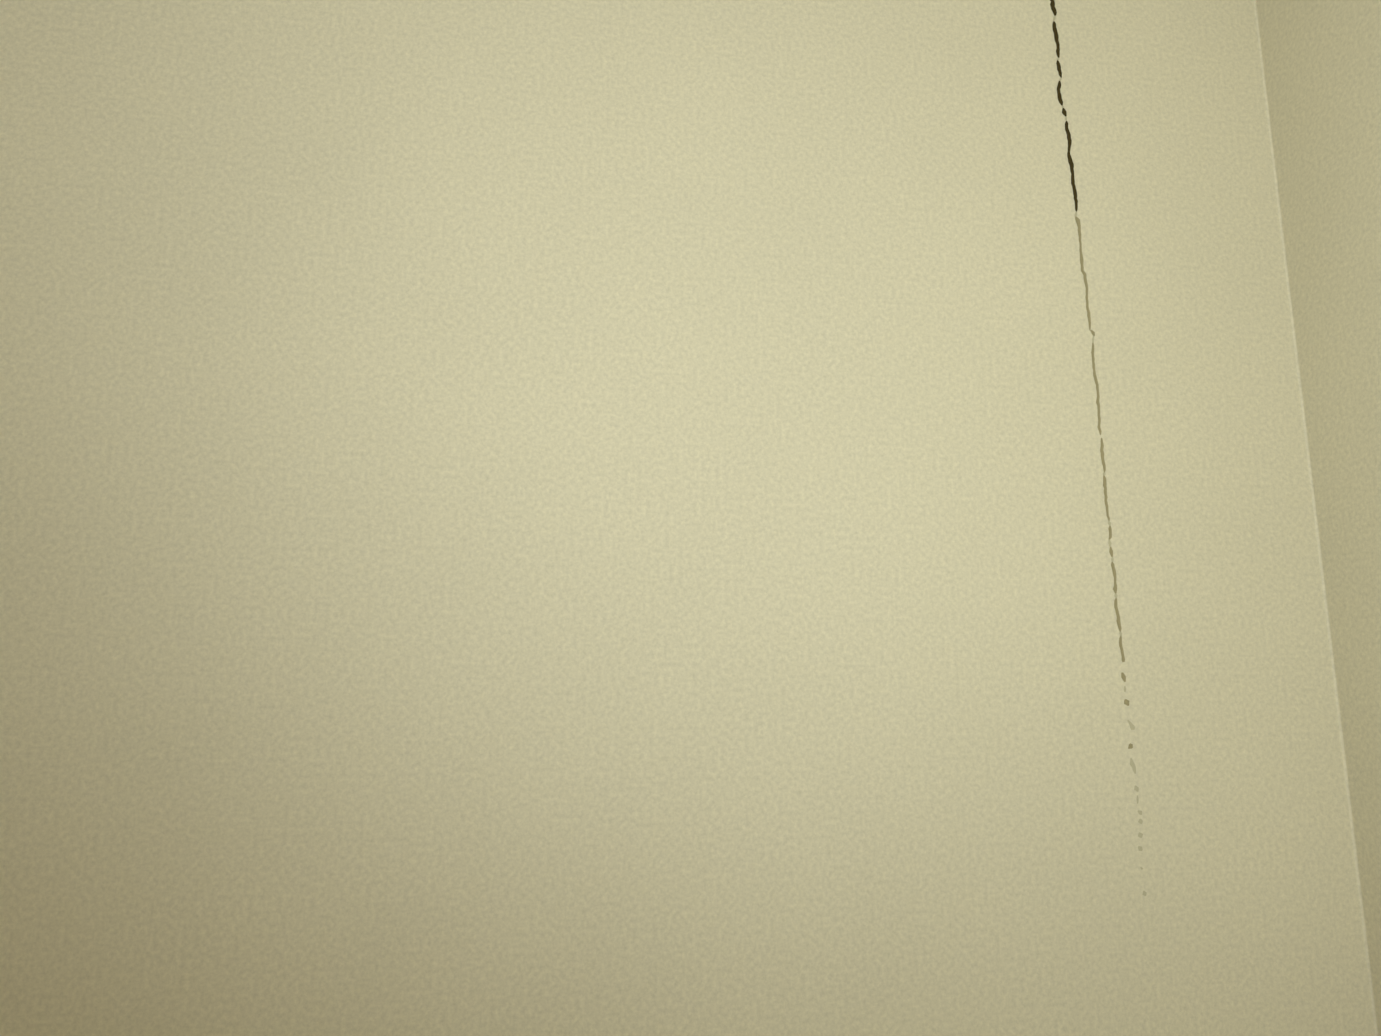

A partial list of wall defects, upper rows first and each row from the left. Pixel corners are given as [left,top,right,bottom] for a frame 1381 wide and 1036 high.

crack [1050,0,1147,896]